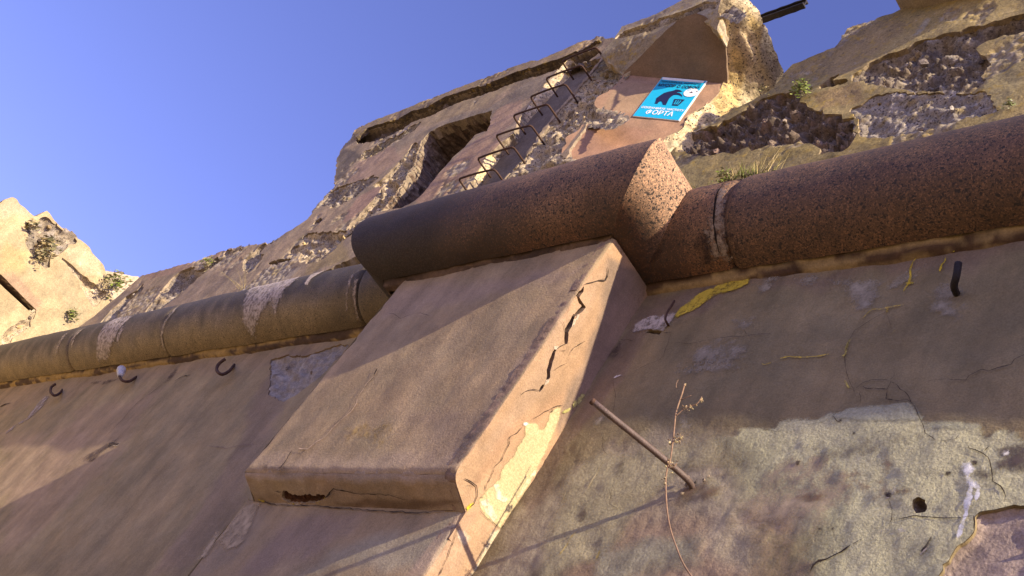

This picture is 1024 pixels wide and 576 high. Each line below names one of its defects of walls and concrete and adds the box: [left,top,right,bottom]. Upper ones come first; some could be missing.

spalling [678,19,1024,156]
spalling [269,345,349,402]
crack [250,266,609,574]
peeling [471,407,561,576]
peeling [544,403,1024,576]
crack [844,306,1006,501]